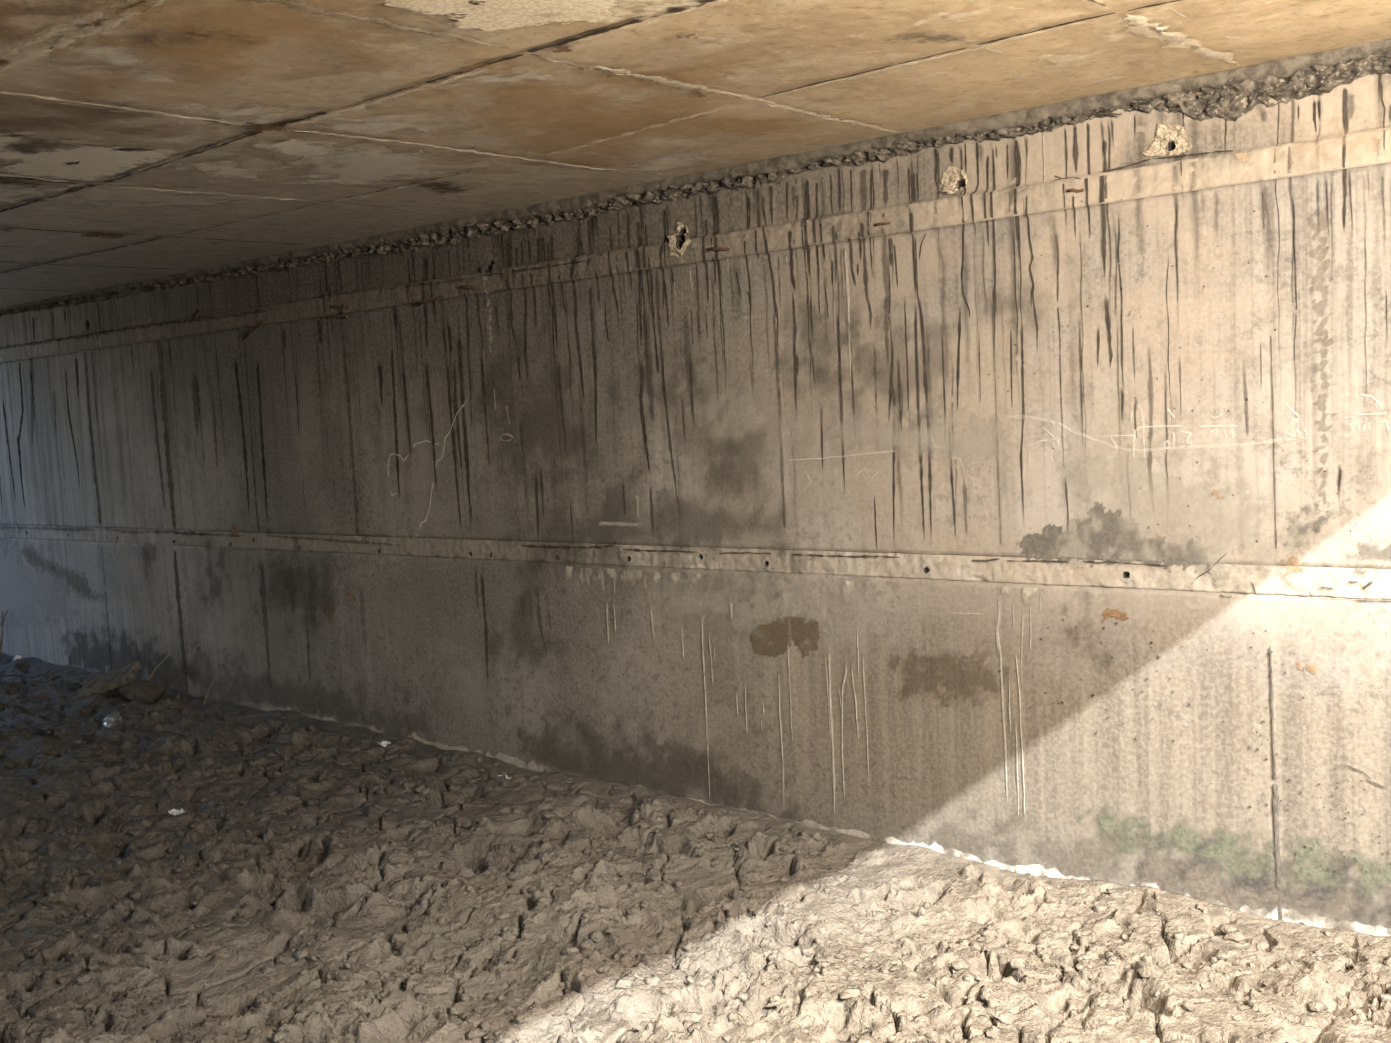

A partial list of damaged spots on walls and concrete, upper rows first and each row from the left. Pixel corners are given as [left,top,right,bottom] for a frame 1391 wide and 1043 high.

peeling [377,0,700,31]
spalling [0,51,1391,317]
leakage [378,136,1045,548]
leakage [1062,122,1136,439]
leakage [1165,210,1181,482]
leakage [1274,101,1320,359]
leakage [1317,89,1352,228]
leakage [1379,74,1391,147]
leakage [1017,458,1210,573]
leakage [520,566,871,823]
leakage [885,586,1123,880]
leakage [1130,840,1391,937]